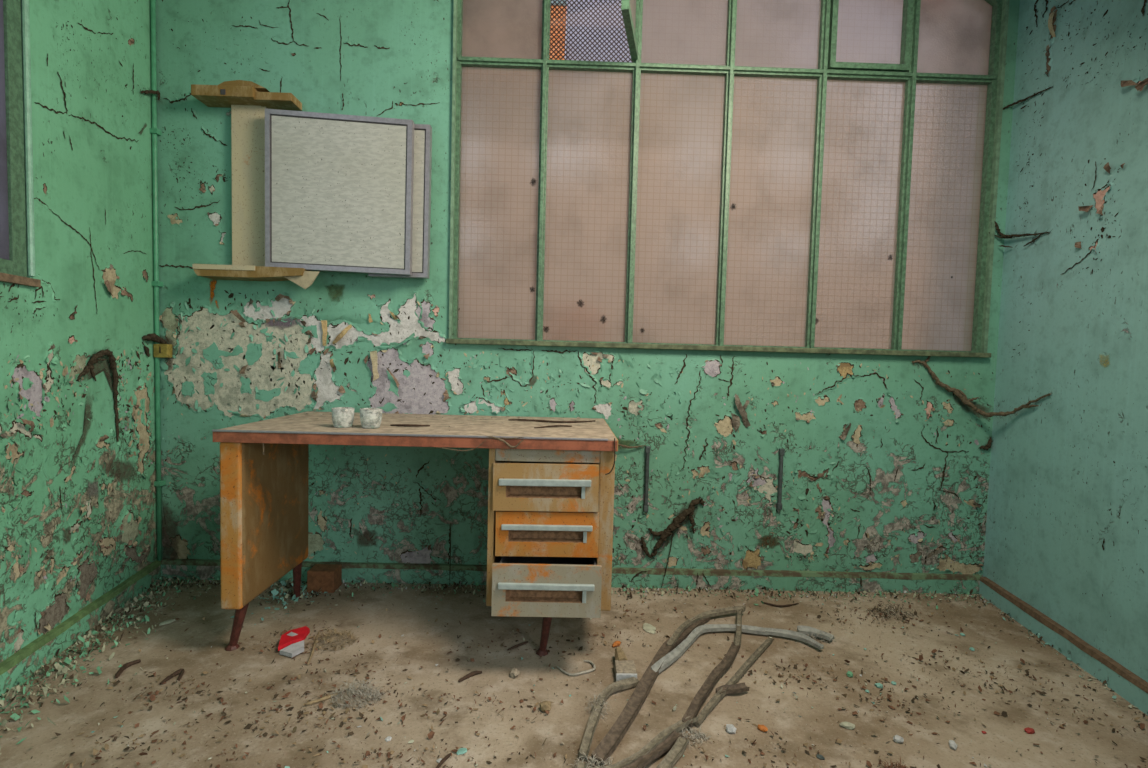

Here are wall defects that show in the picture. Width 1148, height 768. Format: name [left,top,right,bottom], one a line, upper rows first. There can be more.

crack [35,54,139,150]
crack [163,92,227,146]
crack [232,0,389,110]
peeling [1021,0,1141,137]
peeling [1121,70,1148,93]
crack [34,198,106,308]
crack [123,250,193,269]
peeling [0,284,993,654]
peeling [0,576,221,762]
peeling [611,584,1148,721]